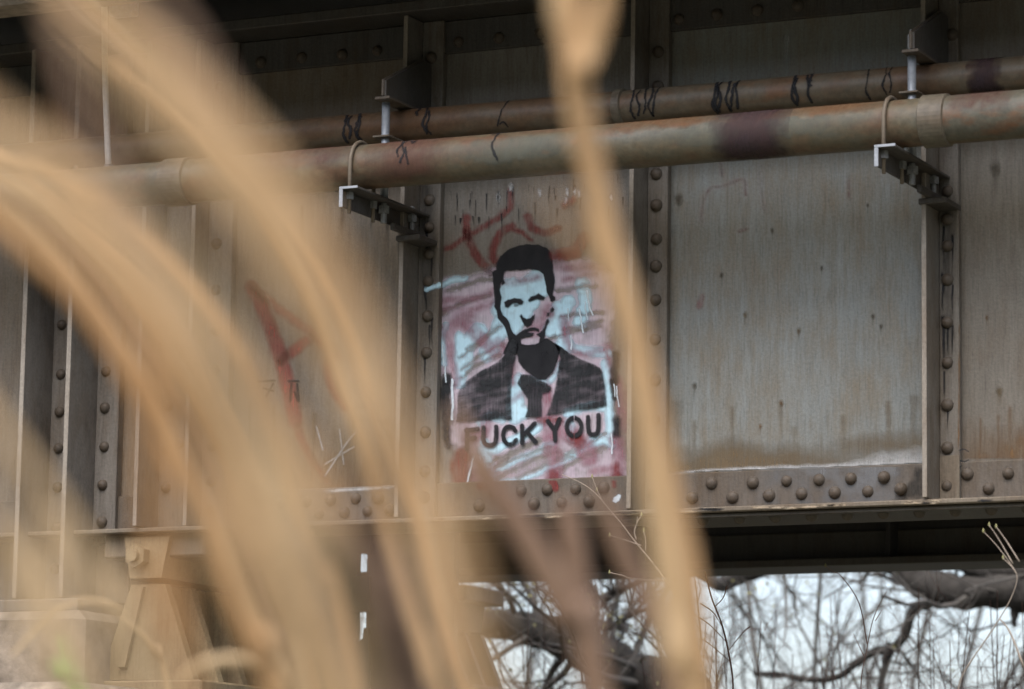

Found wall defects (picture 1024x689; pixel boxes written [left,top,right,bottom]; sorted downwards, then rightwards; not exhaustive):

rust [966,57,1003,106]
rust [721,109,785,160]
rust [677,445,822,473]